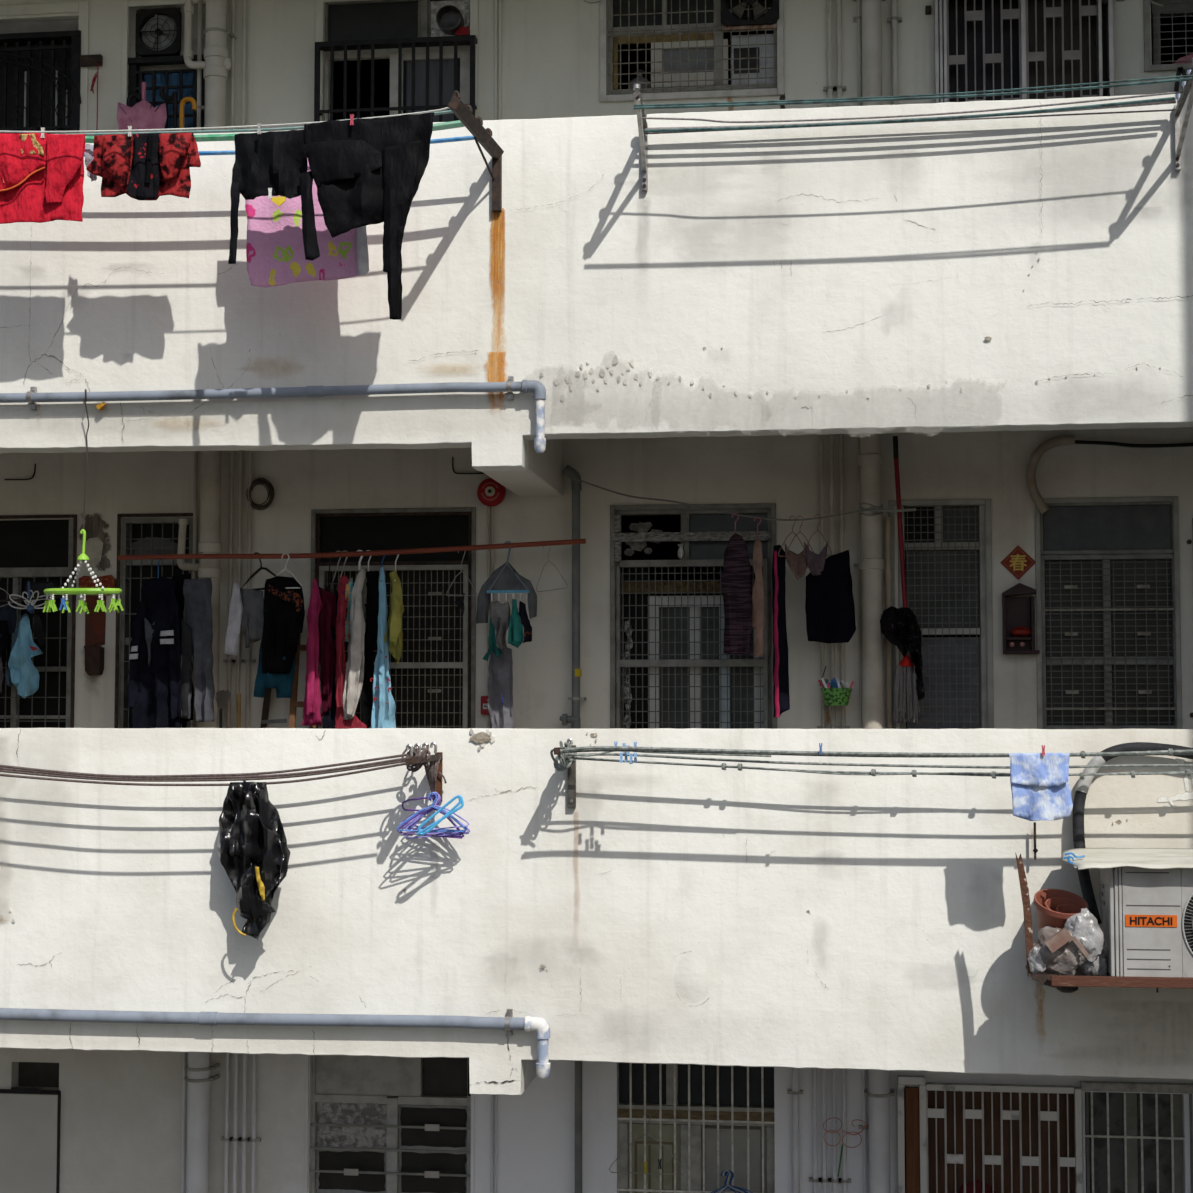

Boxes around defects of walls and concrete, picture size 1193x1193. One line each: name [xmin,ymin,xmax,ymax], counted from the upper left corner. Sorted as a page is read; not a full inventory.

crack [1,235,151,391]
corrosion [486,208,505,398]